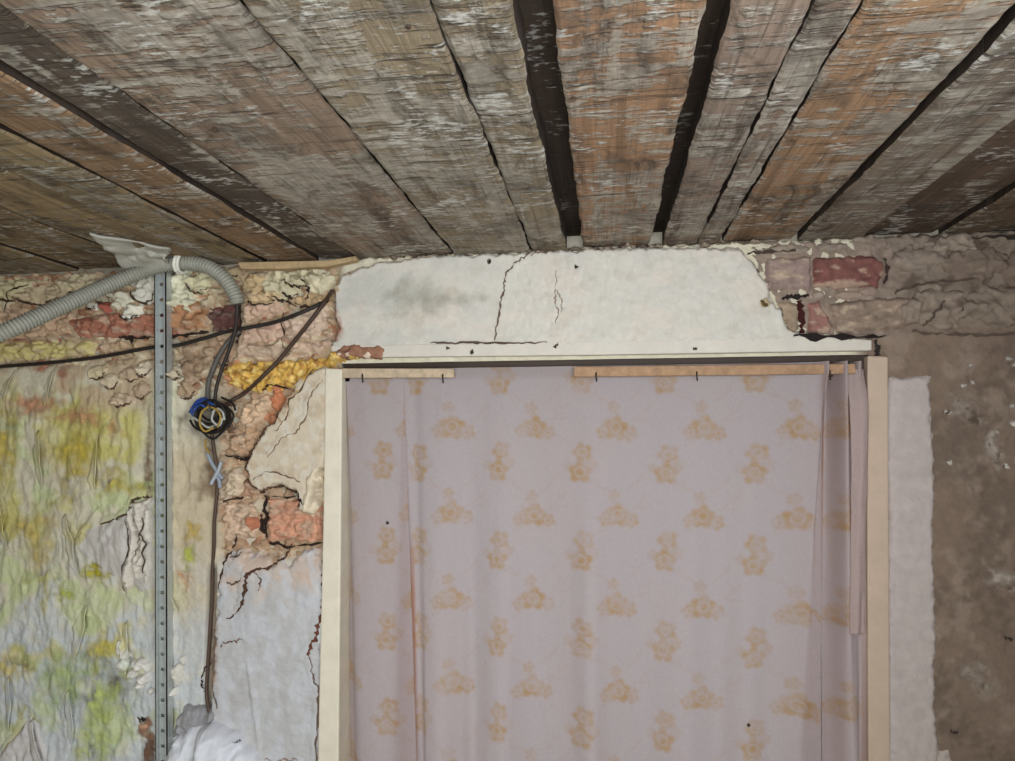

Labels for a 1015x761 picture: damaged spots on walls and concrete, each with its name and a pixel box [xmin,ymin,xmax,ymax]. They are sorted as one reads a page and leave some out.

crack [431,250,563,348]
spalling [747,239,918,356]
spalling [0,266,384,558]
crack [245,367,323,508]
damp [44,655,121,759]
damp [86,562,102,578]
crack [200,535,292,709]
crack [265,560,323,761]